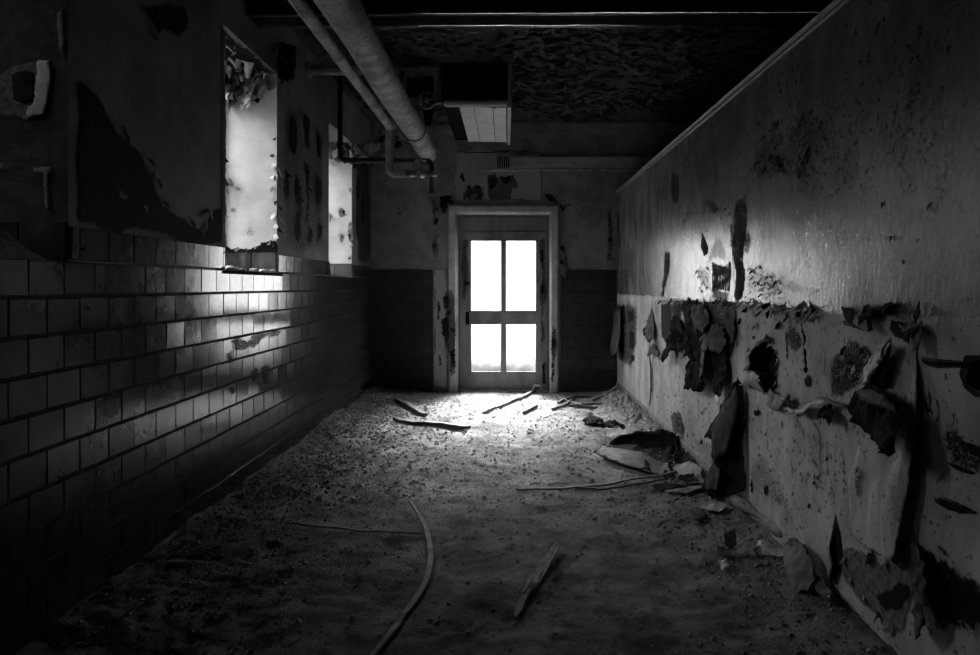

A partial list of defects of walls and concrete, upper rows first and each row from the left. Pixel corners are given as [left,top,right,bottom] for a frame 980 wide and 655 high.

peeling [326,28,386,112]
peeling [375,25,802,124]
peeling [77,29,371,264]
flaking render [431,150,571,257]
damp [712,199,750,304]
flaking render [433,270,448,387]
flaking render [661,302,682,343]
spalling [743,334,779,393]
mould [822,337,872,396]
spalling [839,538,913,633]